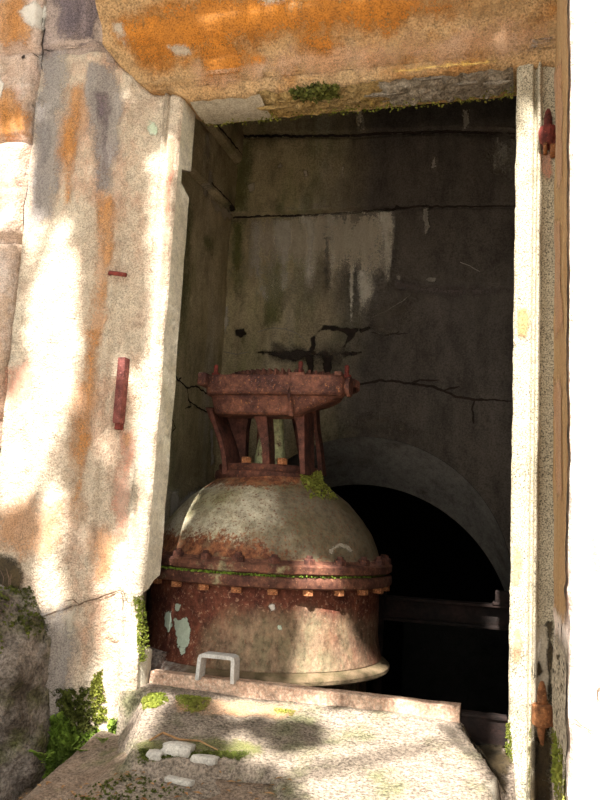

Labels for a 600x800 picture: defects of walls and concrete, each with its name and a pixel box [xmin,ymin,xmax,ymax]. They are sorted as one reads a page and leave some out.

damp [27,51,68,226]
corrosion [57,83,90,202]
damp [85,62,123,191]
damp [250,206,393,298]
crack [258,325,408,373]
corrosion [114,0,568,623]
crack [172,376,207,432]
crack [360,379,513,424]
crack [42,590,129,617]